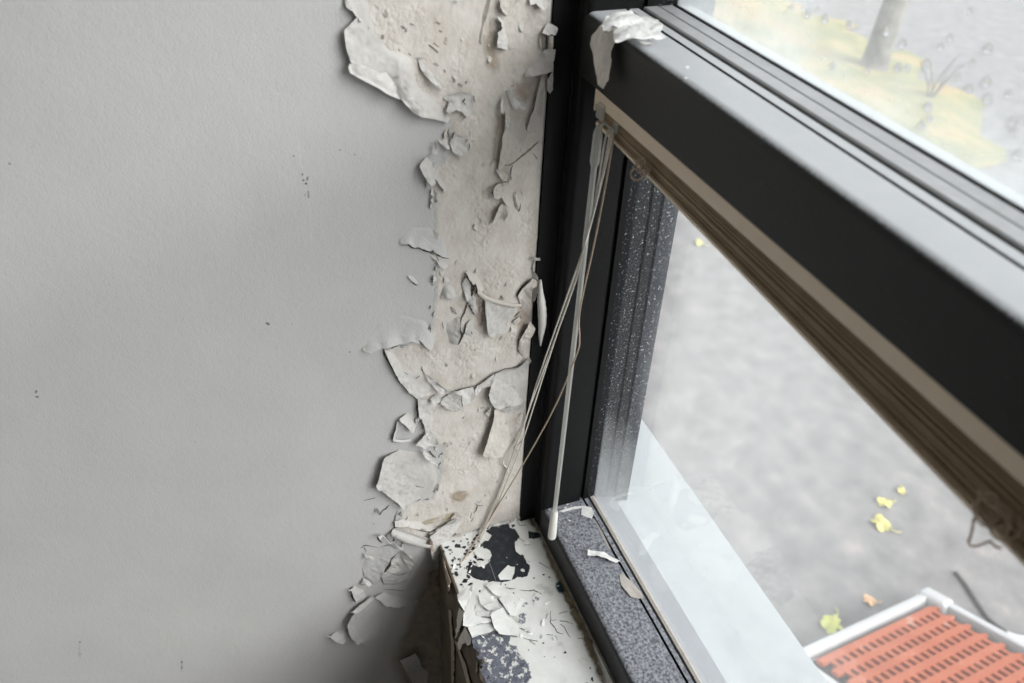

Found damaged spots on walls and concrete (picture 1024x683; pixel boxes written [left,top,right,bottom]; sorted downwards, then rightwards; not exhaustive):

flaking render [325,0,560,683]
peeling [590,10,666,89]